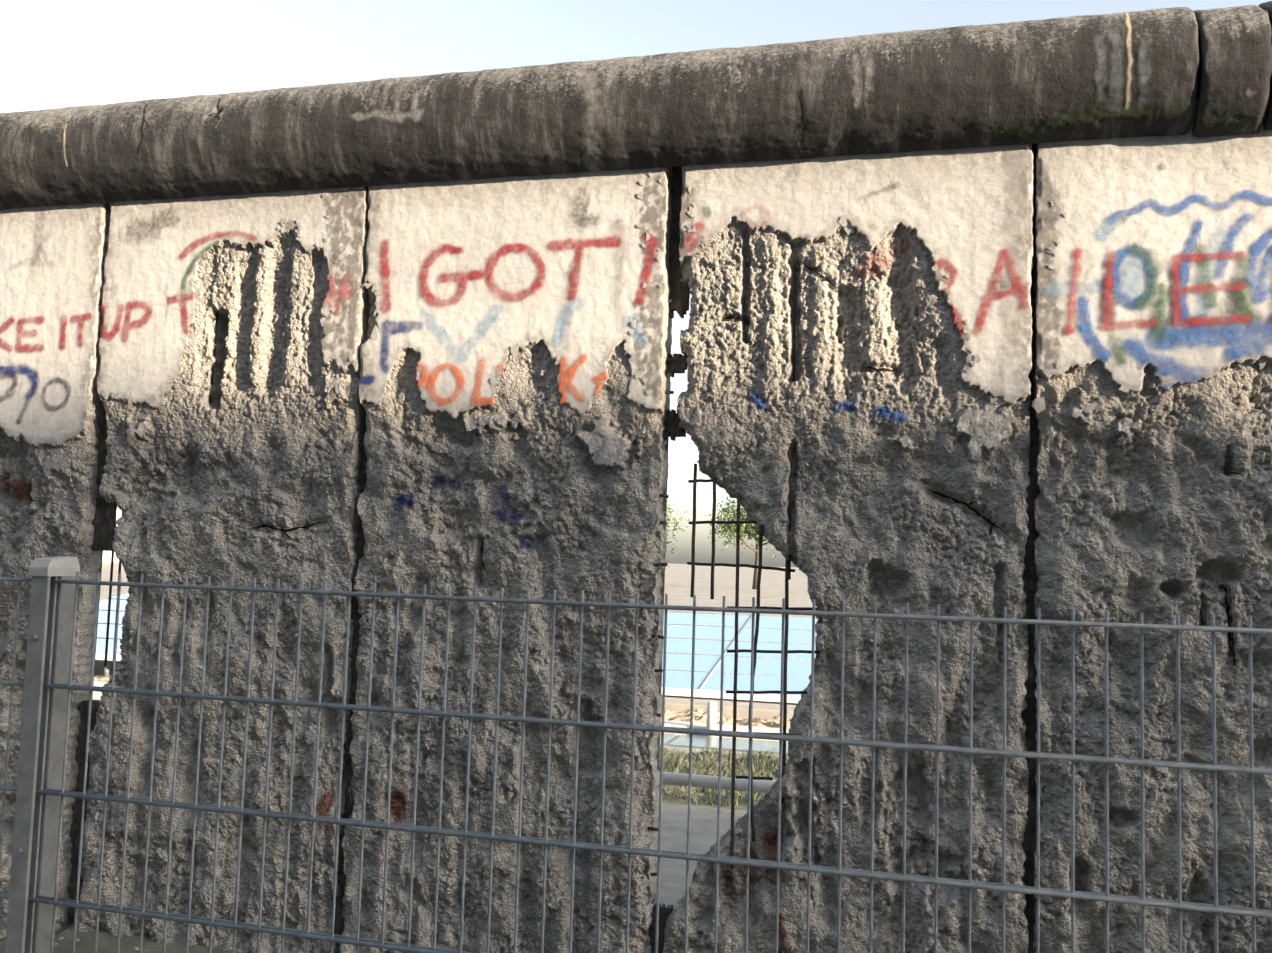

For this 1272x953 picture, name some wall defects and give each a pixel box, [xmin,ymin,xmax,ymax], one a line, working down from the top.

crack [249,517,328,542]
spalling [72,172,1272,953]
crack [925,487,1014,540]
spalling [0,422,96,892]
spalling [52,813,71,930]